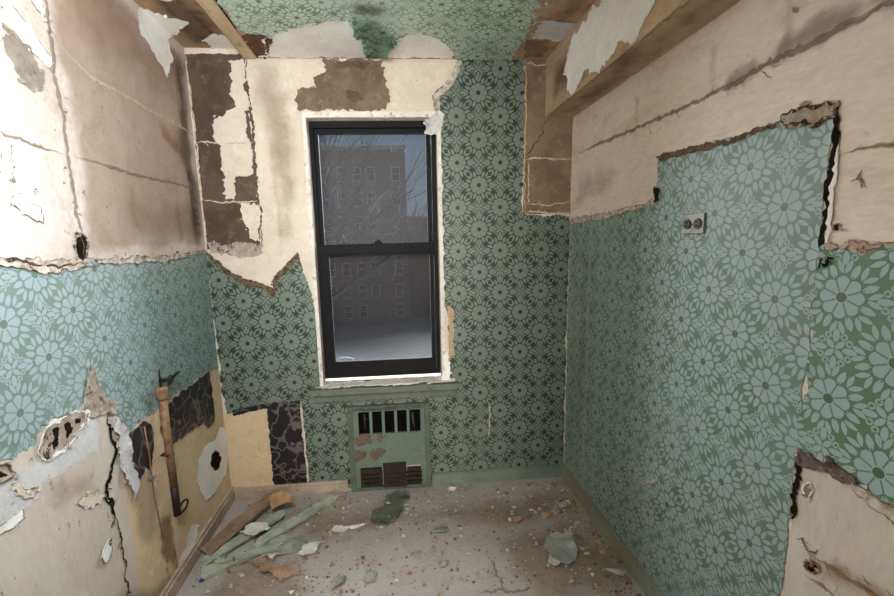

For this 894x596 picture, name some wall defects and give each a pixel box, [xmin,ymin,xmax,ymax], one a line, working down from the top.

spalling [0,0,52,92]
peeling [138,7,189,78]
peeling [156,59,263,263]
spalling [242,20,458,113]
peeling [524,0,655,96]
crack [580,0,894,153]
spalling [770,100,840,130]
crack [815,101,894,270]
spalling [73,230,103,267]
spalling [37,364,119,461]
crack [104,415,131,596]
crack [789,462,891,596]